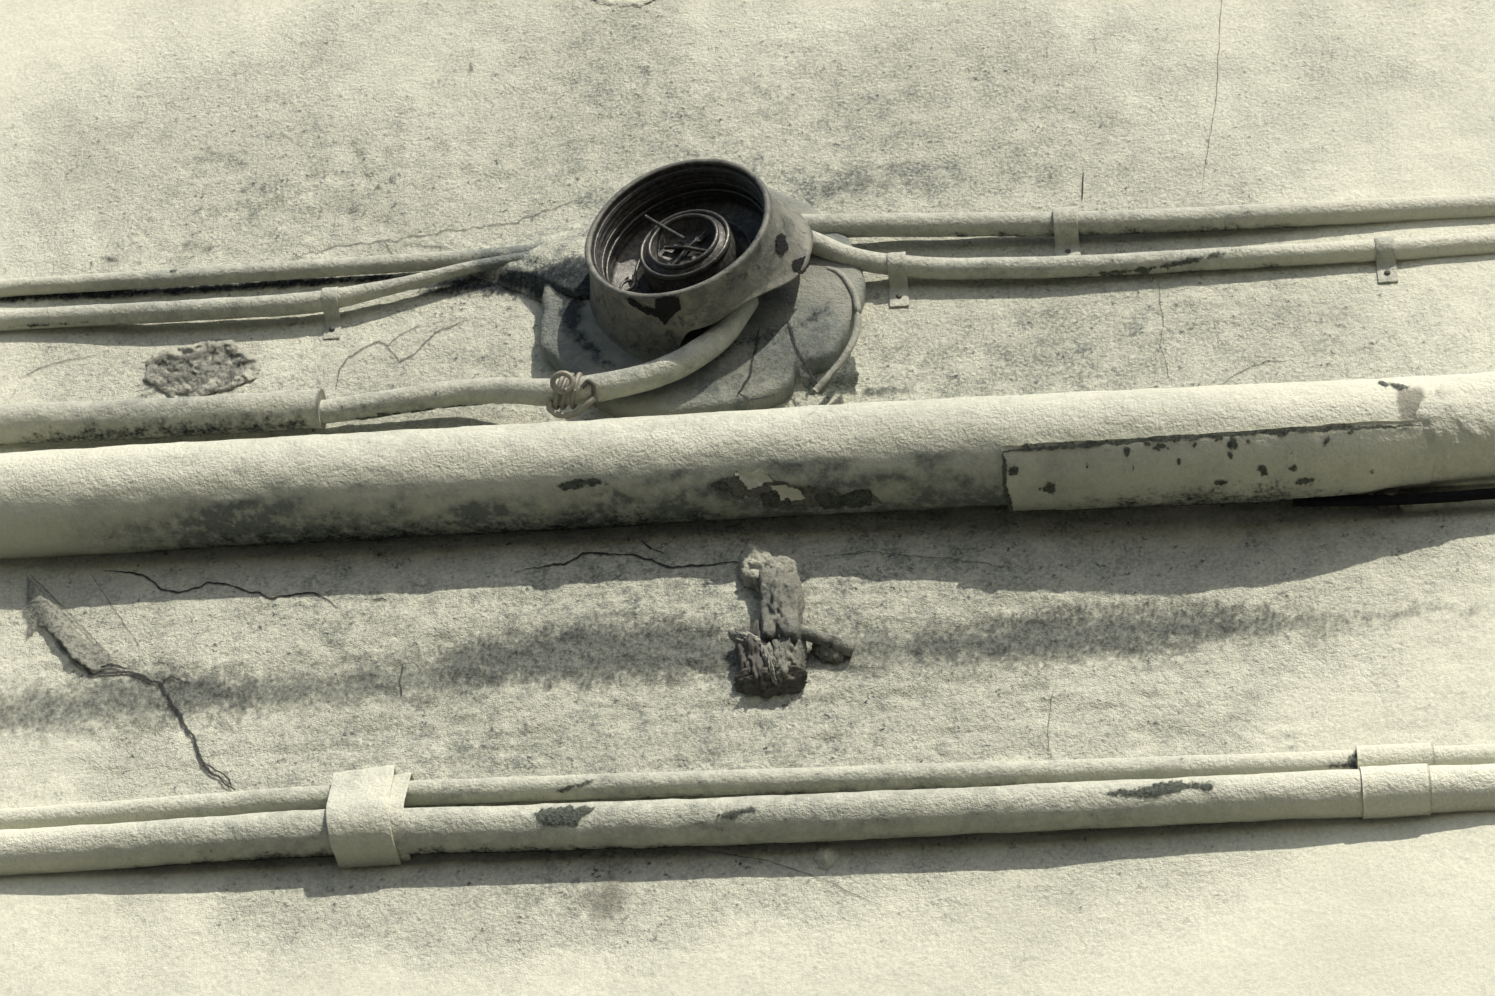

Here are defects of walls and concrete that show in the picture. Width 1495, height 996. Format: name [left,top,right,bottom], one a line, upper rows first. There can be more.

crack [1201,0,1222,192]
flaking render [136,338,261,397]
crack [525,540,737,569]
flaking render [23,574,118,671]
crack [57,570,387,791]
leakage [0,623,740,731]
leakage [807,604,1368,667]